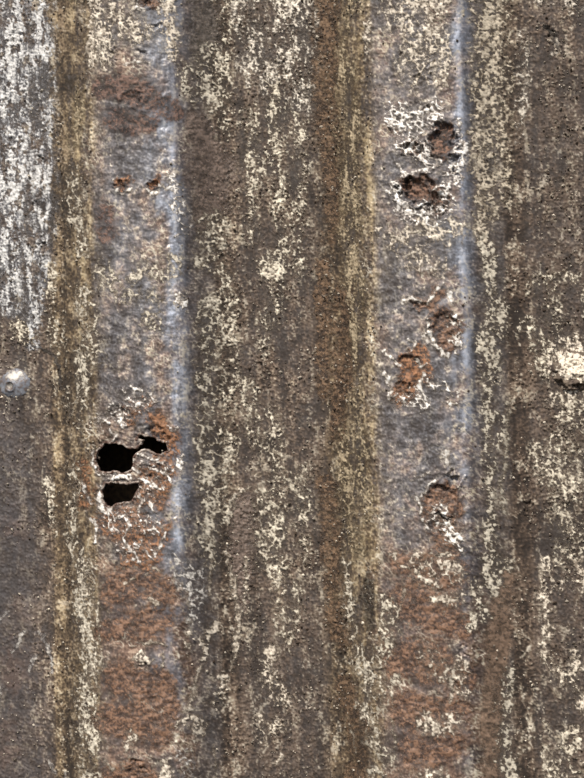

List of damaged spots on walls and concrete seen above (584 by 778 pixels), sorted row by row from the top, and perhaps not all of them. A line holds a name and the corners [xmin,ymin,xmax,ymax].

corrosion [401,123,455,161]
corrosion [148,173,161,190]
corrosion [396,174,450,215]
corrosion [409,285,465,357]
corrosion [390,343,434,407]
corrosion [77,395,181,643]
corrosion [383,480,477,778]
corrosion [90,659,180,750]
corrosion [97,757,157,778]